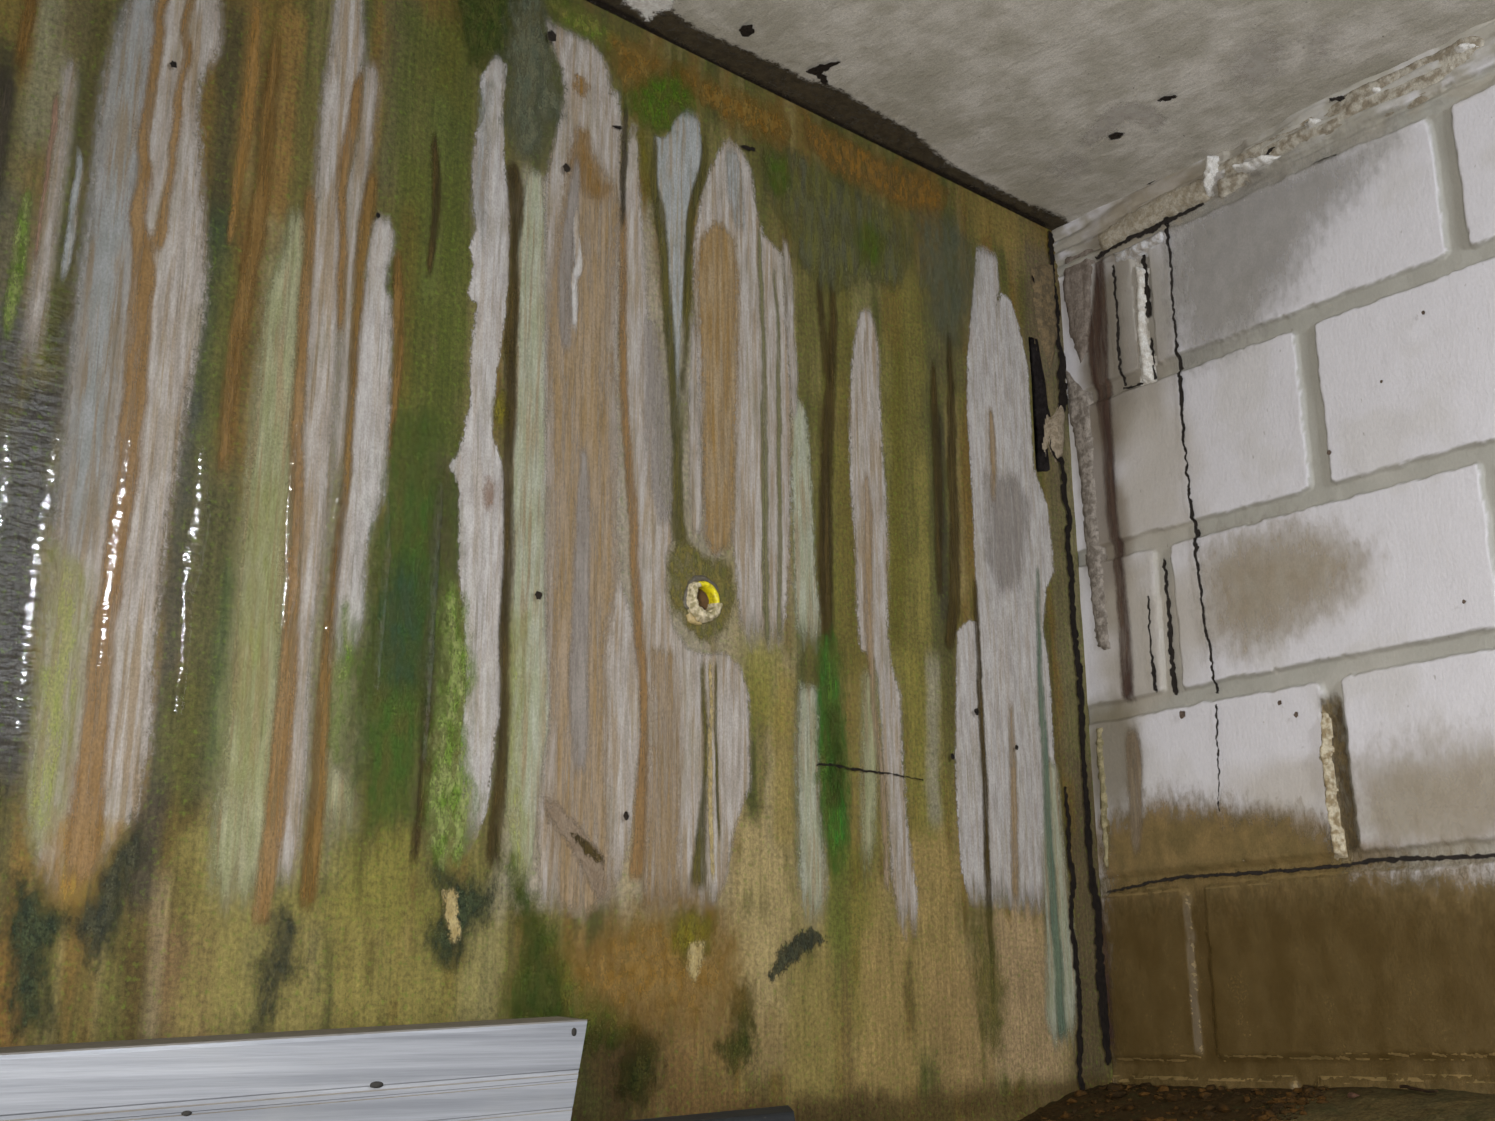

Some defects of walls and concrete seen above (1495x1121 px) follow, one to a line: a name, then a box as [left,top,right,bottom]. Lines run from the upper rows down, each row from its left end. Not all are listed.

damp [4,0,222,900]
damp [210,0,393,922]
damp [426,22,819,916]
damp [795,687,826,914]
damp [586,0,1069,231]
damp [849,310,918,928]
damp [955,248,1077,1040]
peeling [1113,230,1165,386]
crack [1032,203,1495,1090]
damp [1096,798,1495,1094]
peeling [1203,36,1485,200]